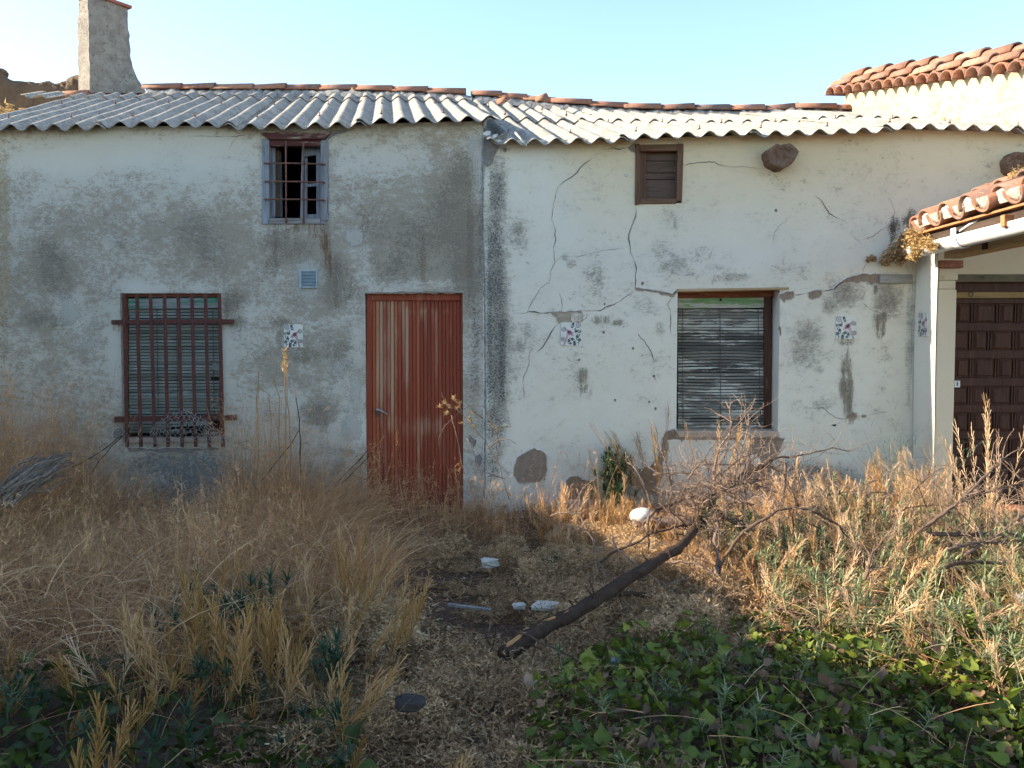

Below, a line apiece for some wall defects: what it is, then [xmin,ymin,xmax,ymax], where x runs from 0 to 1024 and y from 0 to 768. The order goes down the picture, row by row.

crack [523,148,637,393]
flaking render [778,273,880,303]
damp [471,172,508,481]
flaking render [550,309,584,323]
flaking render [513,447,548,484]